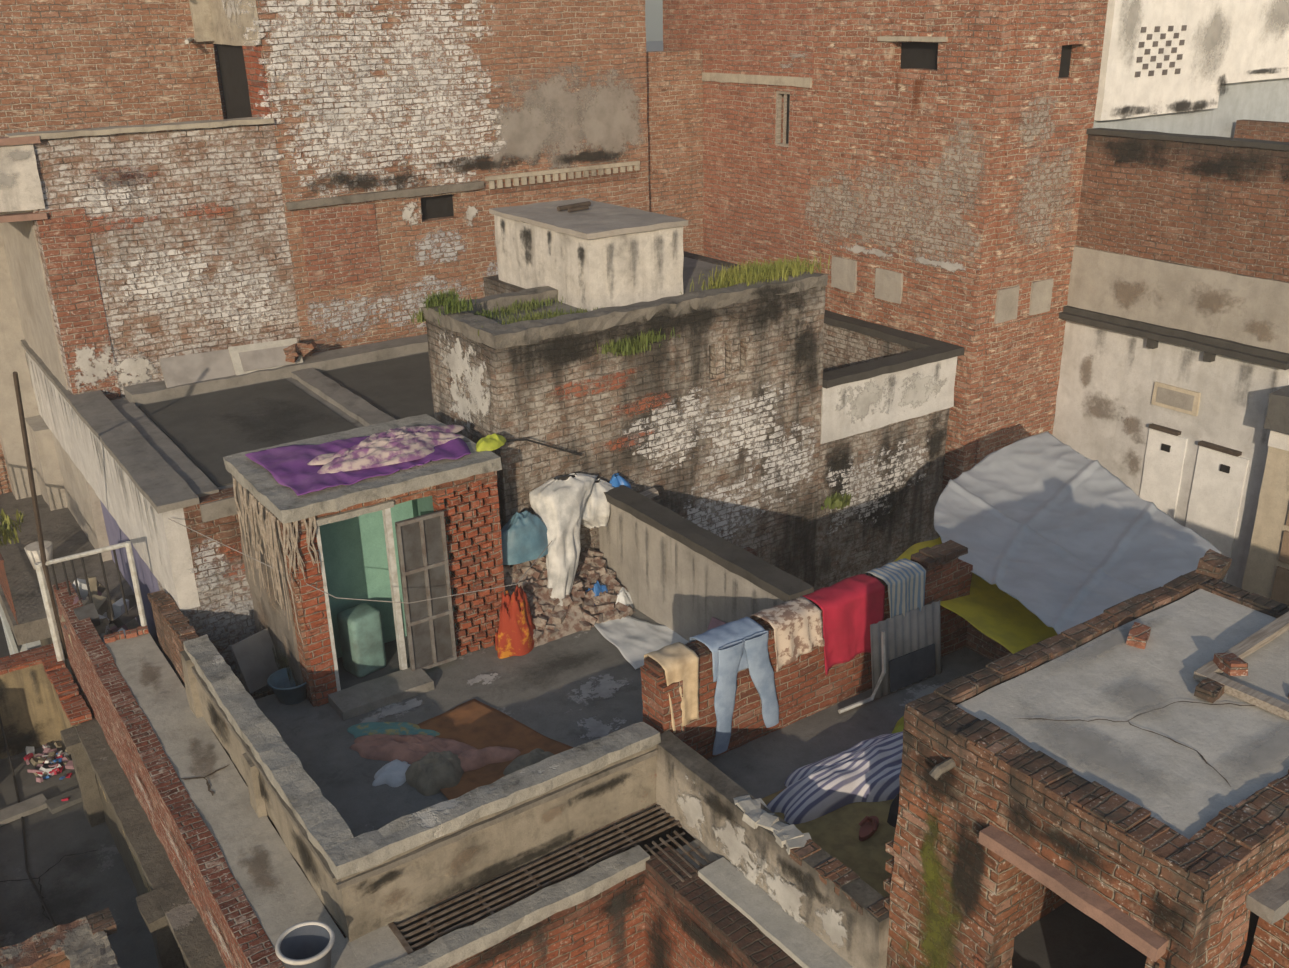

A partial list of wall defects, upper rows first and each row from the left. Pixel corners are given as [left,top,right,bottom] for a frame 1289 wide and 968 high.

water stain [1170,100,1208,112]
water stain [308,173,417,190]
peeling [221,0,506,340]
water stain [437,155,517,173]
water stain [559,151,619,163]
peeling [109,248,288,332]
peeling [70,340,158,393]
flaking render [439,333,490,429]
peeling [553,368,929,540]
crack [1019,701,1255,787]
spalling [733,795,812,855]
water stain [953,823,985,918]